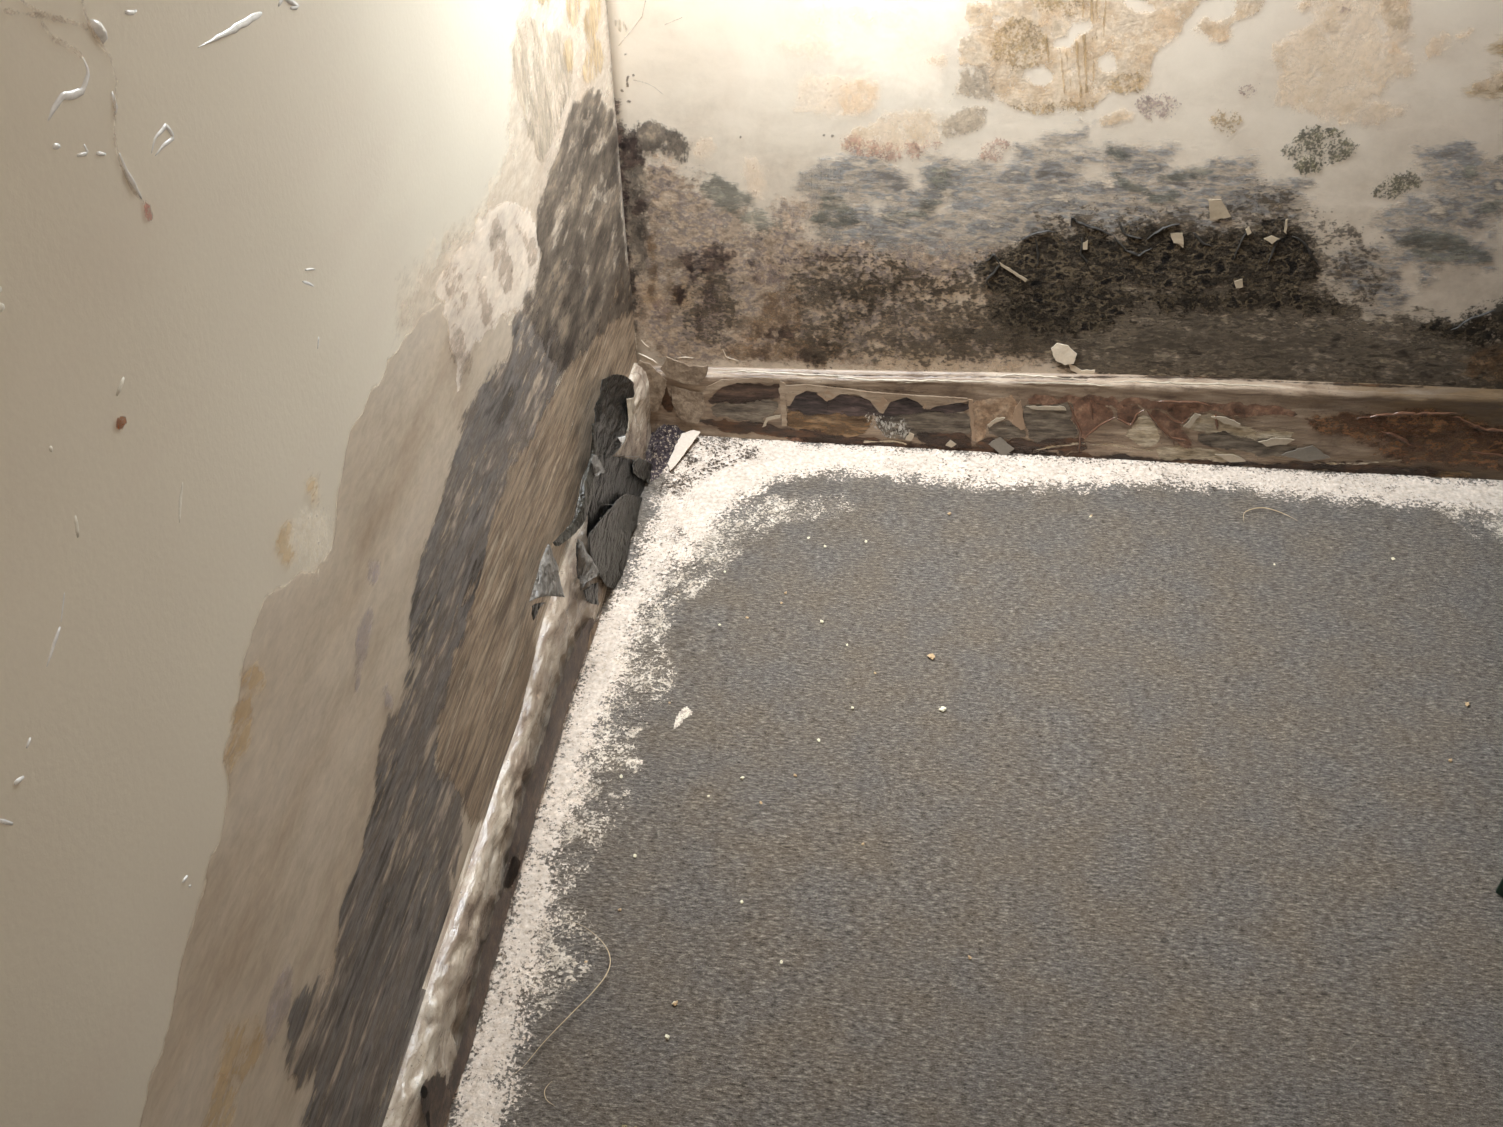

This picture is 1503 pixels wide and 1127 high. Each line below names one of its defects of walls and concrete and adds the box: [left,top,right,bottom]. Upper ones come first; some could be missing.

crack [48,19,118,121]
leakage [565,0,603,82]
leakage [941,107,986,137]
leakage [959,64,994,100]
leakage [1101,93,1182,125]
leakage [1209,109,1242,137]
crack [119,153,152,221]
leakage [645,124,1503,389]
peeling [1051,343,1095,374]
peeling [635,333,1087,471]
peeling [1126,413,1330,462]
leakage [141,88,690,1127]